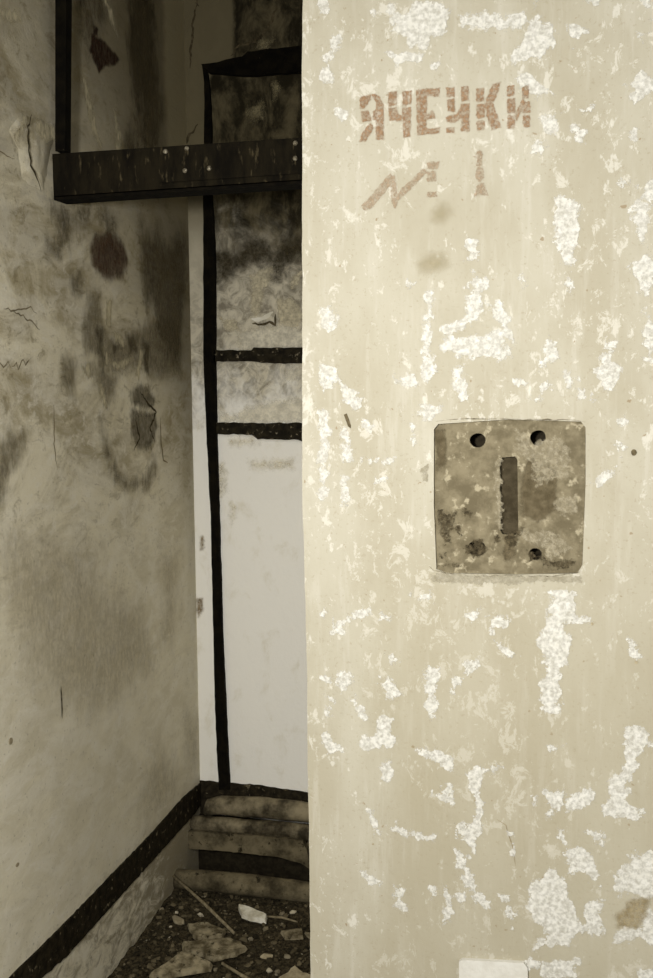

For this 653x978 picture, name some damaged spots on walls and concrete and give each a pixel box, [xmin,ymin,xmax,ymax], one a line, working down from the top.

peeling [370,0,589,101]
peeling [552,195,583,293]
water stain [64,234,185,486]
peeling [392,238,514,402]
peeling [316,364,397,507]
spalling [470,433,486,447]
spalling [530,430,546,445]
rust [437,508,523,558]
rust [527,550,575,569]
peeling [535,590,594,714]
peeling [530,724,653,821]
peeling [428,763,653,978]